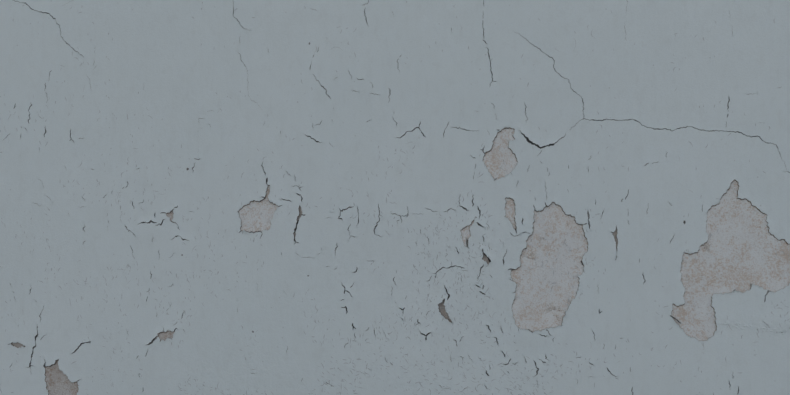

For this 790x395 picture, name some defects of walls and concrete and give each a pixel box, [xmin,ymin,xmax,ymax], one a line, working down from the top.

crack [349,72,497,138]
peeling [480,127,518,181]
crack [517,36,790,201]
peeling [238,163,282,238]
crack [68,168,189,330]
crack [281,157,527,348]
peeling [508,202,589,339]
peeling [670,179,790,341]
crack [10,284,47,372]
peeling [43,359,79,395]
peeling [147,328,177,345]
crack [450,325,549,389]